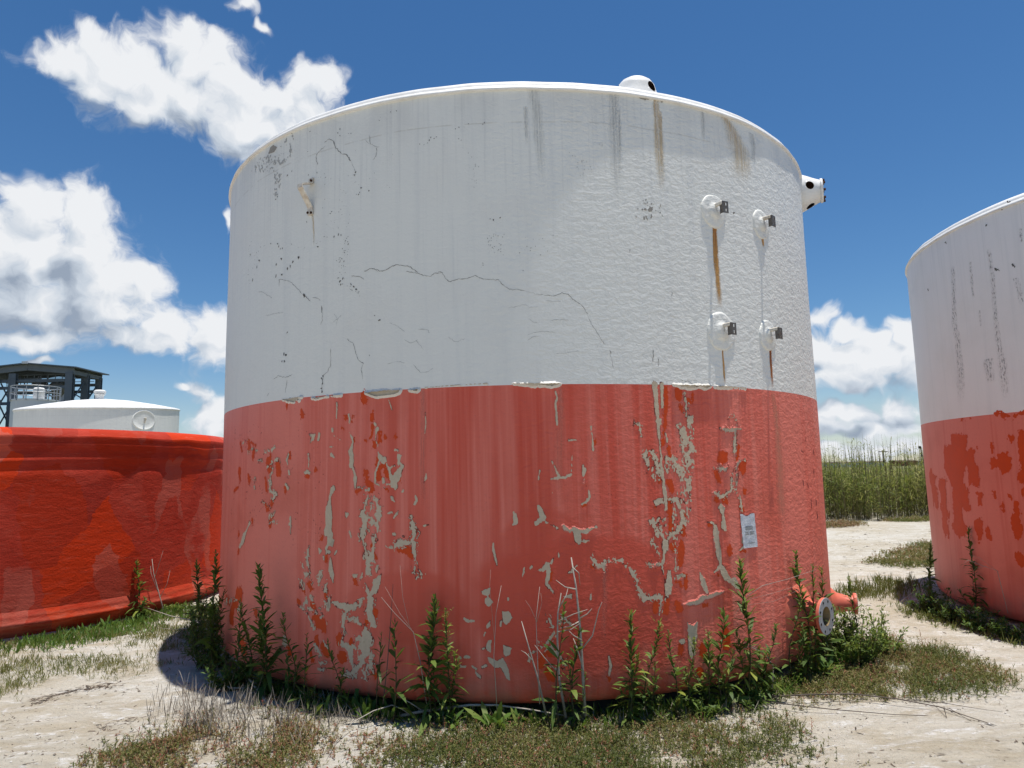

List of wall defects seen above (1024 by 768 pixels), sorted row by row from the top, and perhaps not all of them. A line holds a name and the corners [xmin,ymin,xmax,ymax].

crack [356,264,613,363]
peeling [538,458,591,508]
peeling [929,410,1024,568]
peeling [234,375,429,682]
peeling [534,505,598,545]
peeling [568,381,747,680]
peeling [225,585,243,626]
peeling [458,597,513,681]
peeling [481,588,493,607]
peeling [522,552,573,599]
peeling [527,613,573,682]